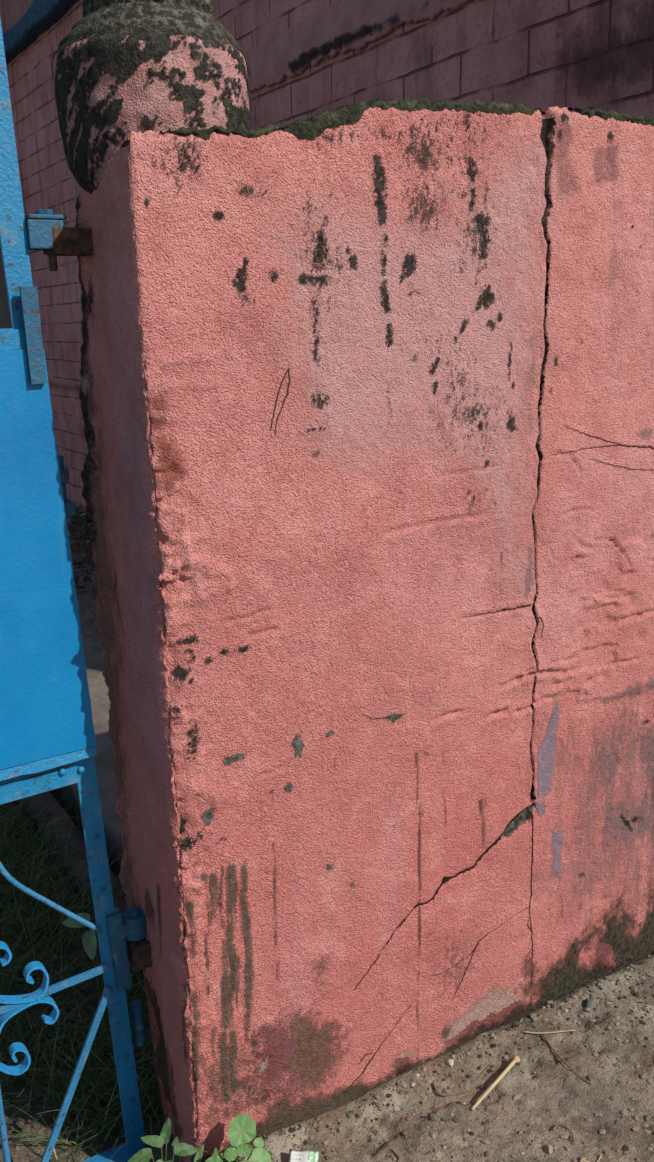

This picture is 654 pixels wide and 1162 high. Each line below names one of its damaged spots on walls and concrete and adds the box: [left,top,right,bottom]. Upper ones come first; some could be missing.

leakage [52,0,251,198]
leakage [232,249,256,306]
leakage [290,179,359,368]
leakage [315,110,518,468]
leakage [310,390,330,409]
crack [355,118,654,1010]
leakage [416,752,428,948]
leakage [178,864,654,1162]